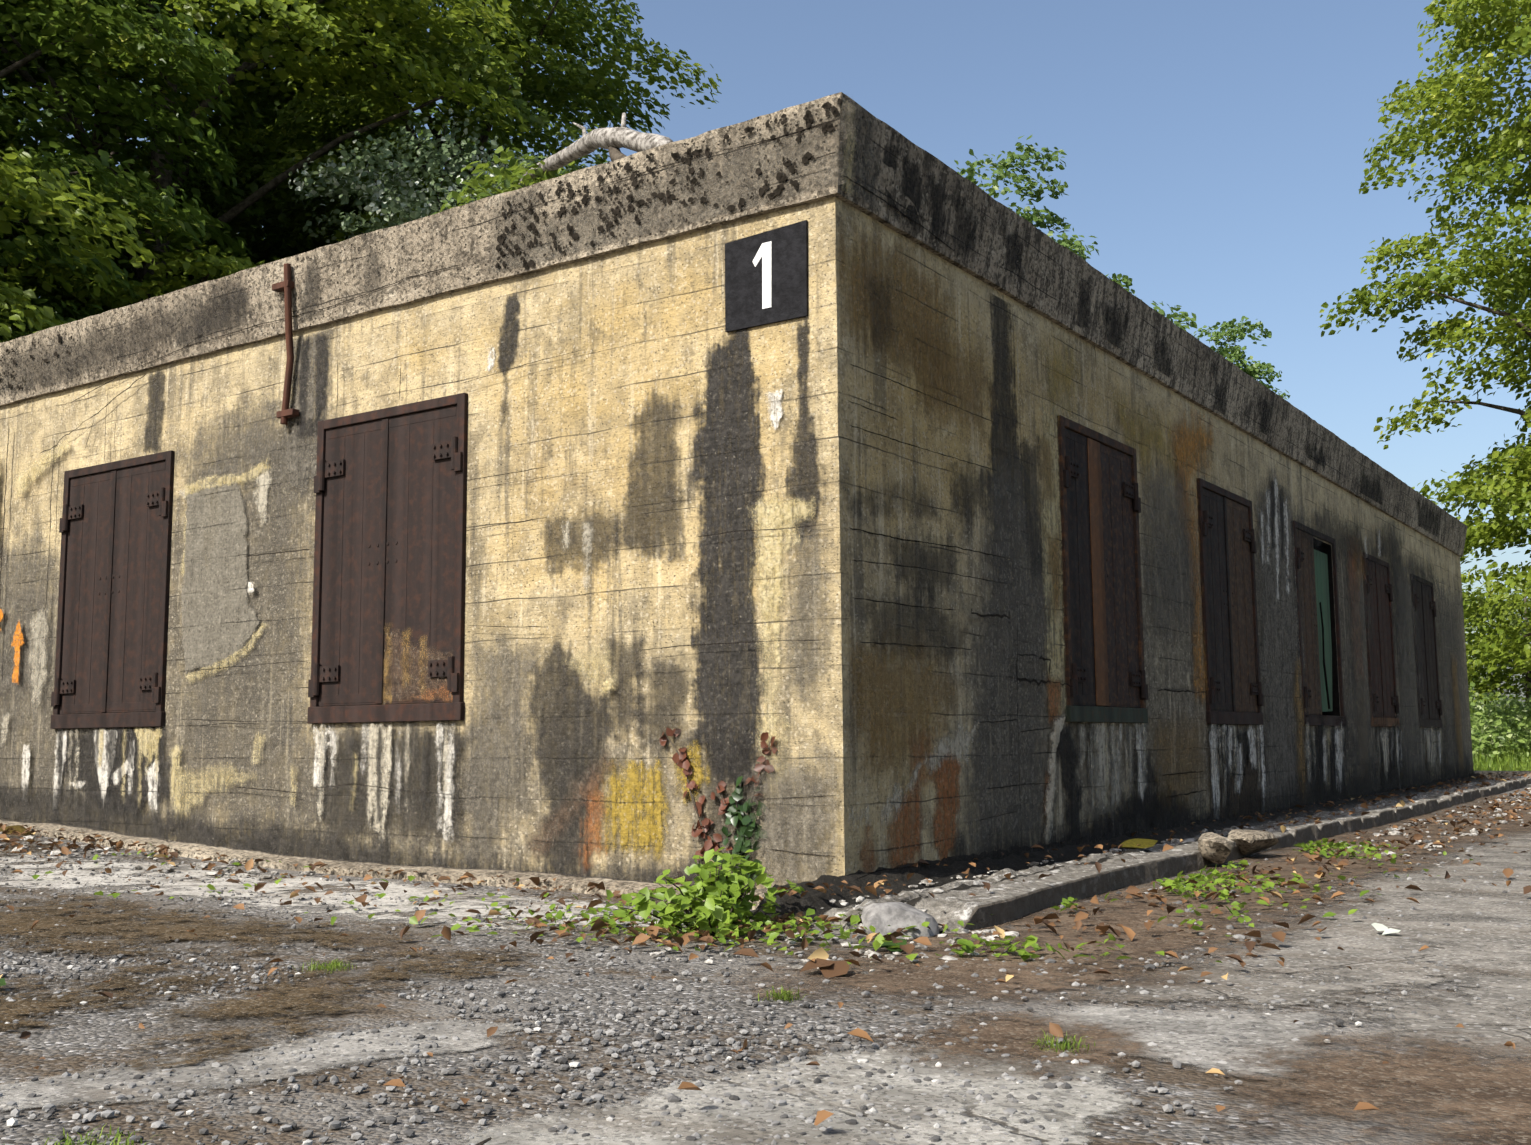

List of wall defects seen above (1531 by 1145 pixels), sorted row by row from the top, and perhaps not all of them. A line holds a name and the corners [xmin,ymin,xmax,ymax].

leakage [846,103,975,252]
leakage [488,294,520,374]
leakage [1004,234,1024,279]
leakage [1077,273,1128,348]
leakage [0,319,836,886]
leakage [861,295,1476,865]
corrosion [861,752,961,873]